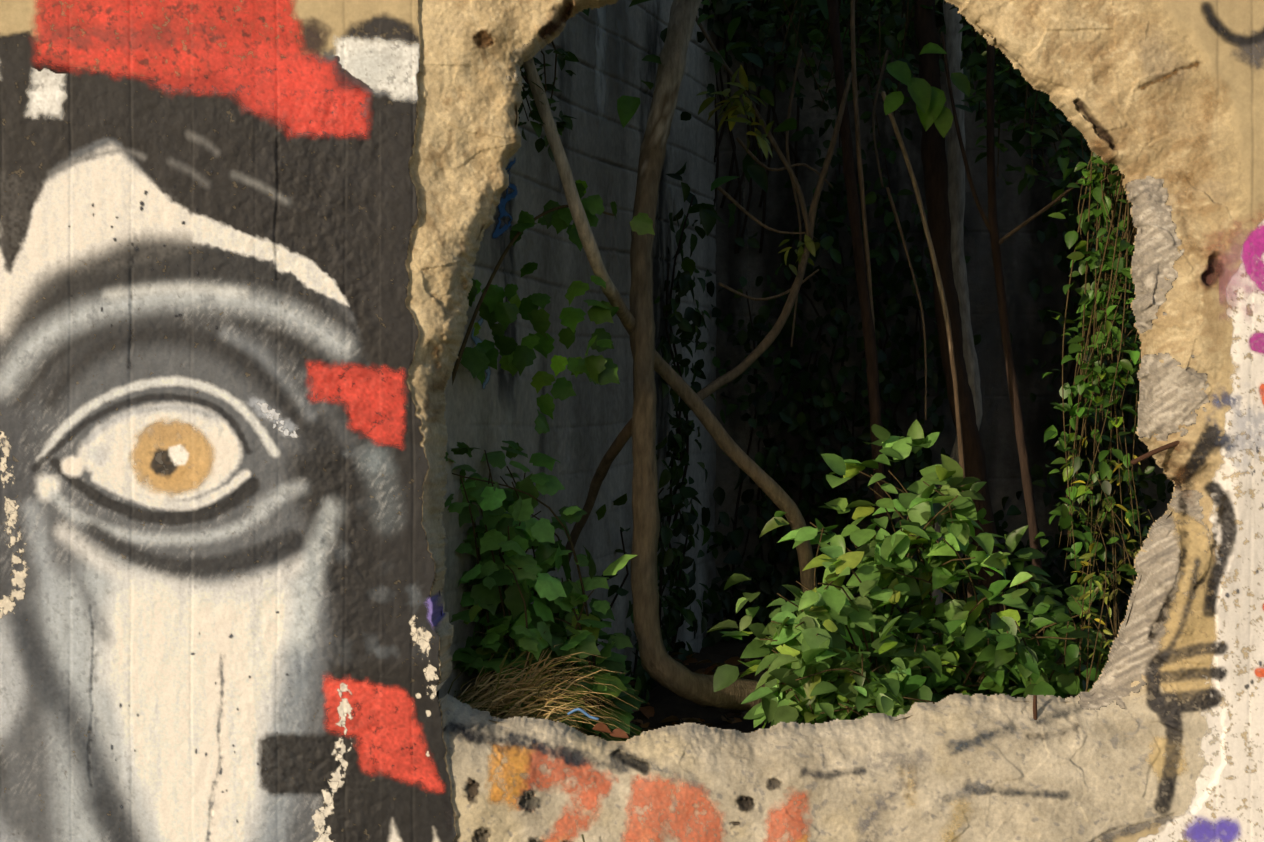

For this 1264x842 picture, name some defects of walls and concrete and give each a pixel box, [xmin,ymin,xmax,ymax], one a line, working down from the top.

spalling [406,0,1260,842]
peeling [0,431,28,618]
peeling [312,683,352,842]